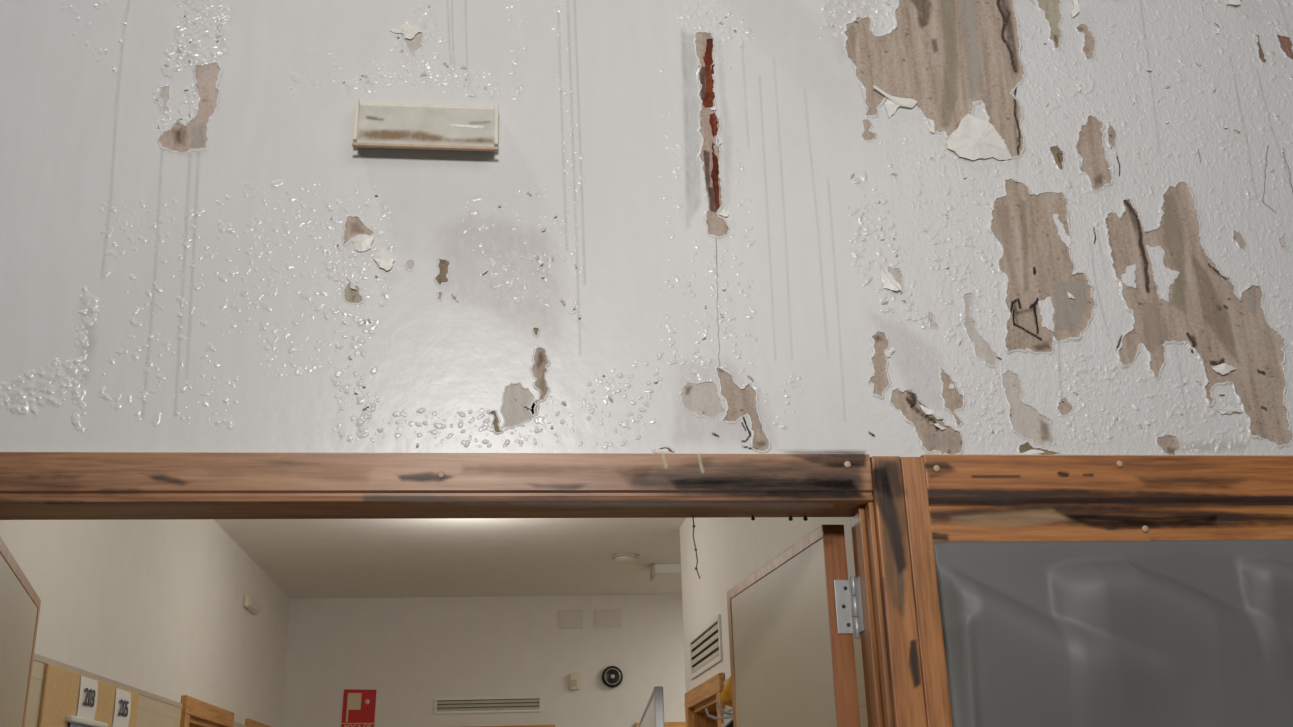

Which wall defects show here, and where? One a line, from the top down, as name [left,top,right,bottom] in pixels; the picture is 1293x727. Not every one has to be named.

peeling [157,61,223,155]
peeling [841,0,1026,160]
peeling [1035,0,1097,61]
peeling [1048,114,1118,193]
peeling [1254,33,1293,64]
peeling [880,264,905,295]
peeling [962,177,1098,455]
peeling [1102,181,1293,449]
peeling [487,326,551,435]
peeling [678,366,772,454]
peeling [867,330,965,454]
peeling [1155,434,1181,455]